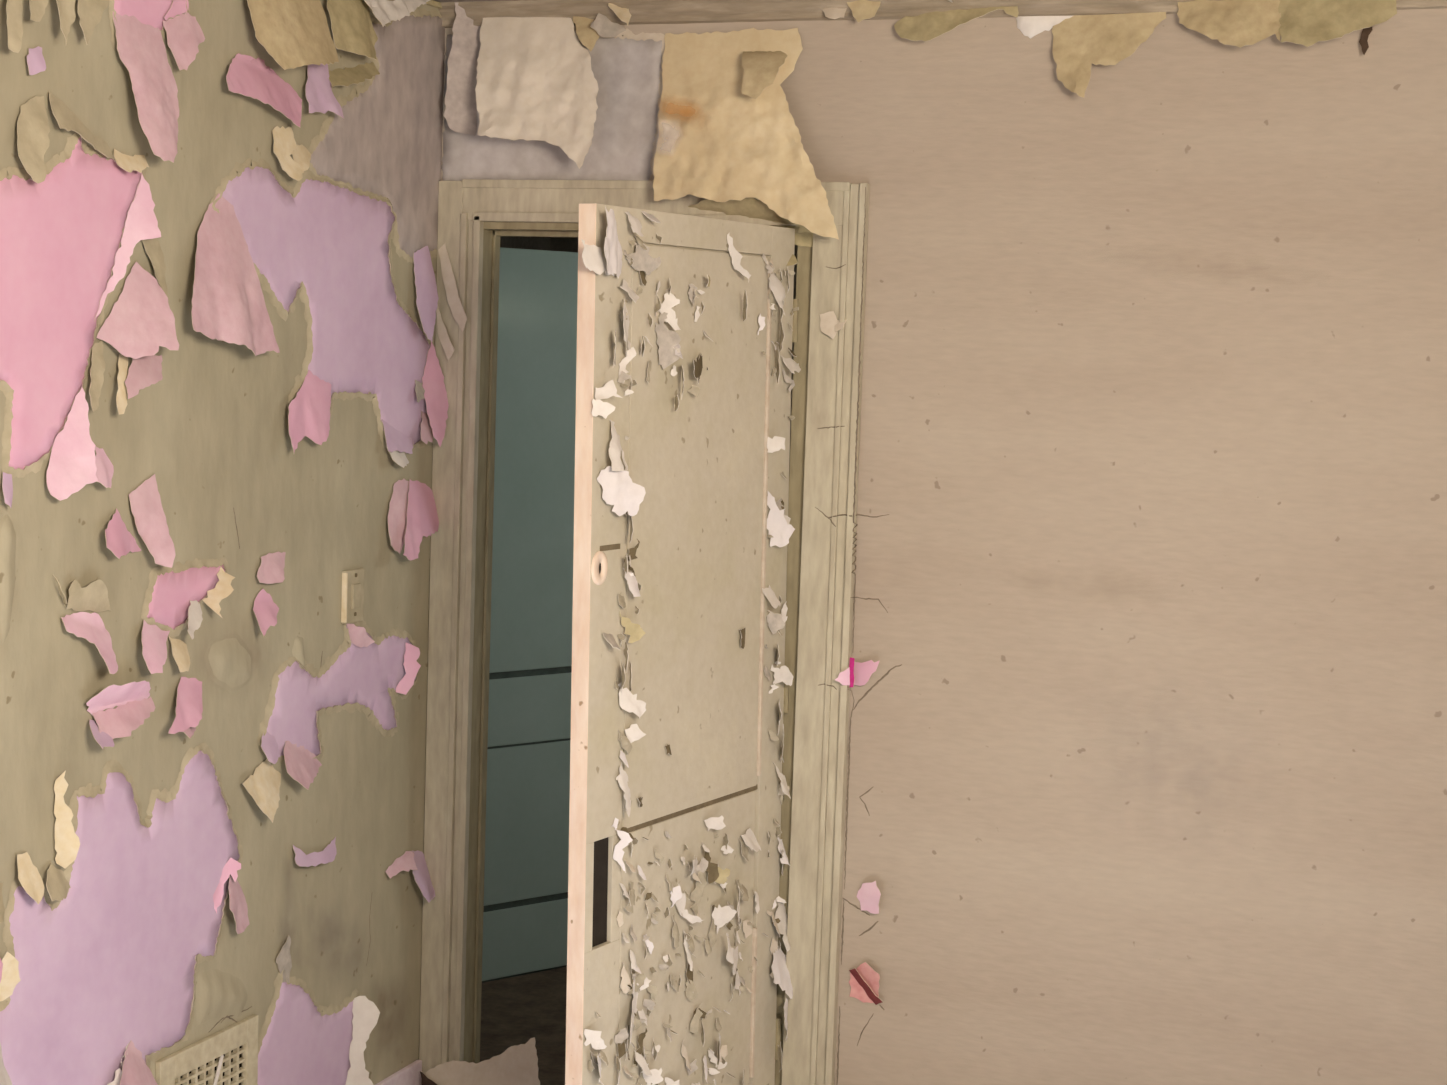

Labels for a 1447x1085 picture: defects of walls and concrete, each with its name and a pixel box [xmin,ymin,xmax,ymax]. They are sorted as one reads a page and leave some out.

peeling [114,0,185,30]
peeling [0,136,142,470]
peeling [222,8,665,447]
peeling [147,565,225,630]
peeling [267,626,416,756]
peeling [582,206,801,1085]
peeling [0,750,240,1085]
peeling [257,982,353,1085]